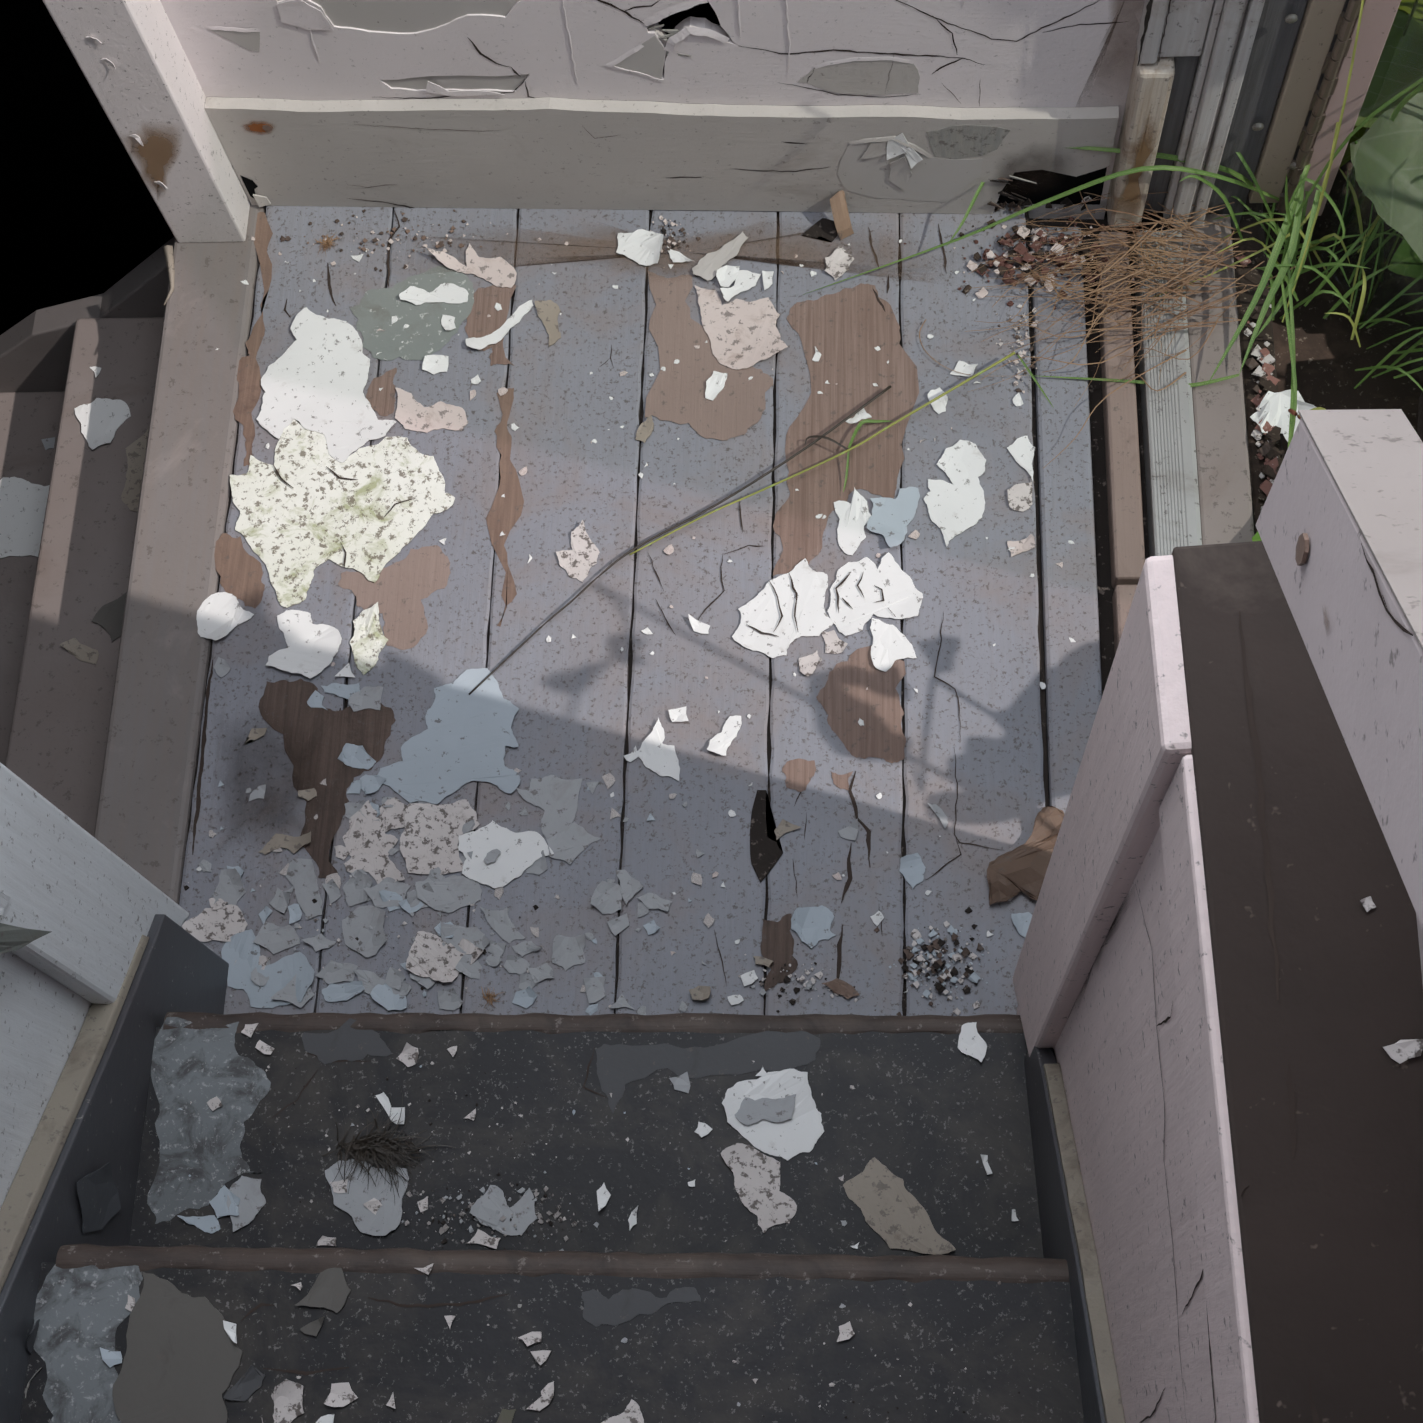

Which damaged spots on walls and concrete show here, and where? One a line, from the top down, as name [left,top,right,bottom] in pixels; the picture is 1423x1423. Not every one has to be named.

crack [468,38,534,98]
crack [562,0,660,89]
crack [736,0,1128,106]
peeling [616,229,788,401]
peeling [230,279,481,712]
peeling [732,361,988,677]
crack [1361,543,1413,636]
peeling [182,668,725,1015]
crack [836,771,871,979]
peeling [721,1061,824,1233]
crack [1135,884,1216,1423]
peeling [100,1268,358,1423]